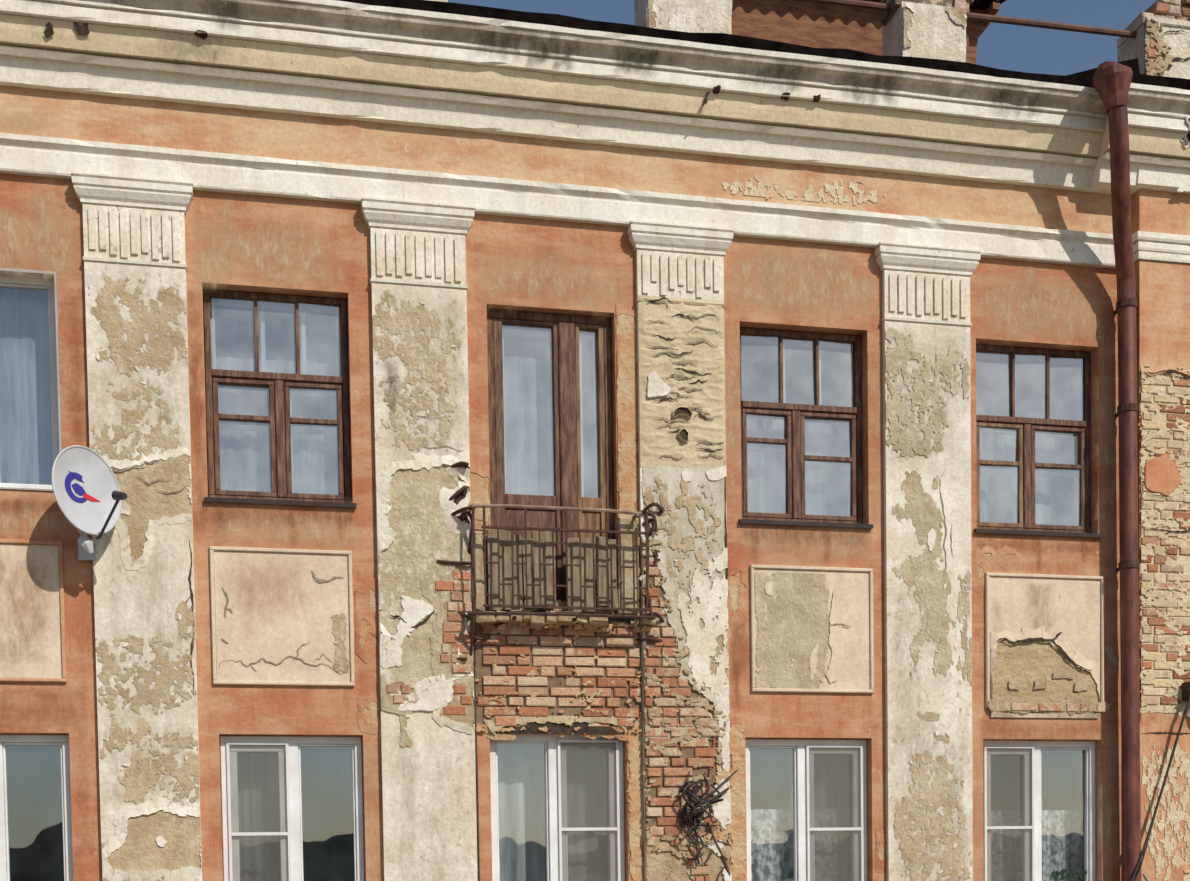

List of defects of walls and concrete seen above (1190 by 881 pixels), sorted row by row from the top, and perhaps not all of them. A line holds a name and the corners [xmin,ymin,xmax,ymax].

peeling [722,174,886,205]
flaking render [1179,115,1190,148]
flaking render [86,275,192,570]
flaking render [95,600,201,881]
crack [184,540,348,694]
flaking render [331,289,843,881]
peeling [876,711,971,881]
peeling [886,327,1022,685]
flaking render [988,626,1121,718]
flaking render [1138,360,1190,727]
peeling [1142,743,1190,881]